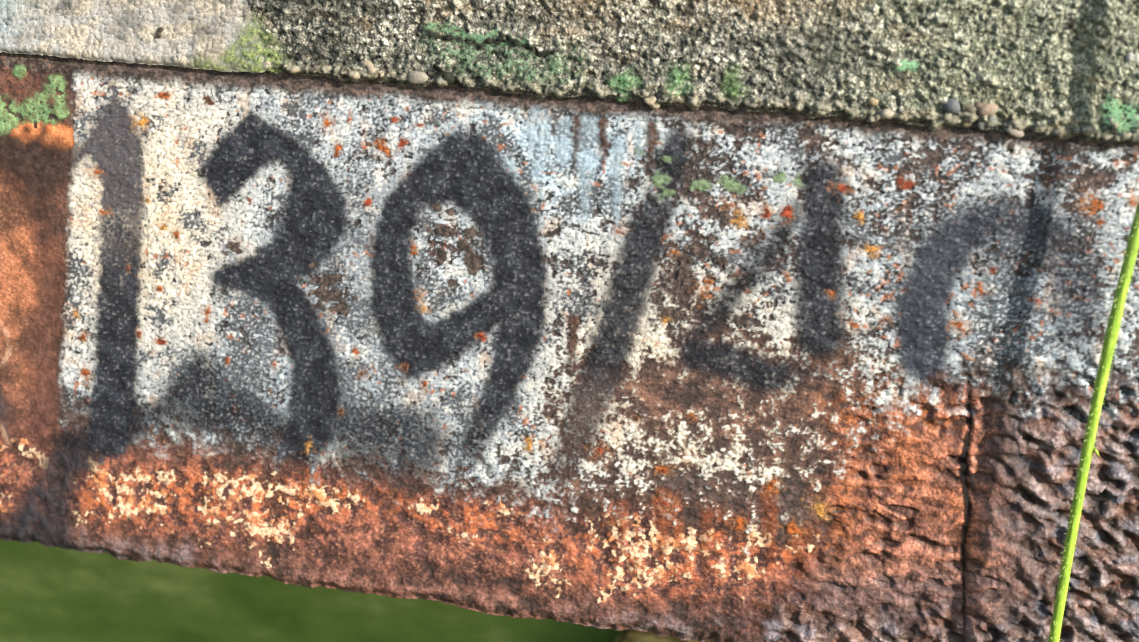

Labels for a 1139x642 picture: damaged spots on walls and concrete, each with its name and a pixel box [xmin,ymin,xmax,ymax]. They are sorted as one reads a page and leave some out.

rust [361,139,409,157]
rust [598,118,609,164]
rust [647,122,660,156]
peeling [0,74,1139,568]
rust [0,171,1139,642]
peeling [513,538,571,598]
peeling [584,492,779,604]
crack [960,376,978,633]